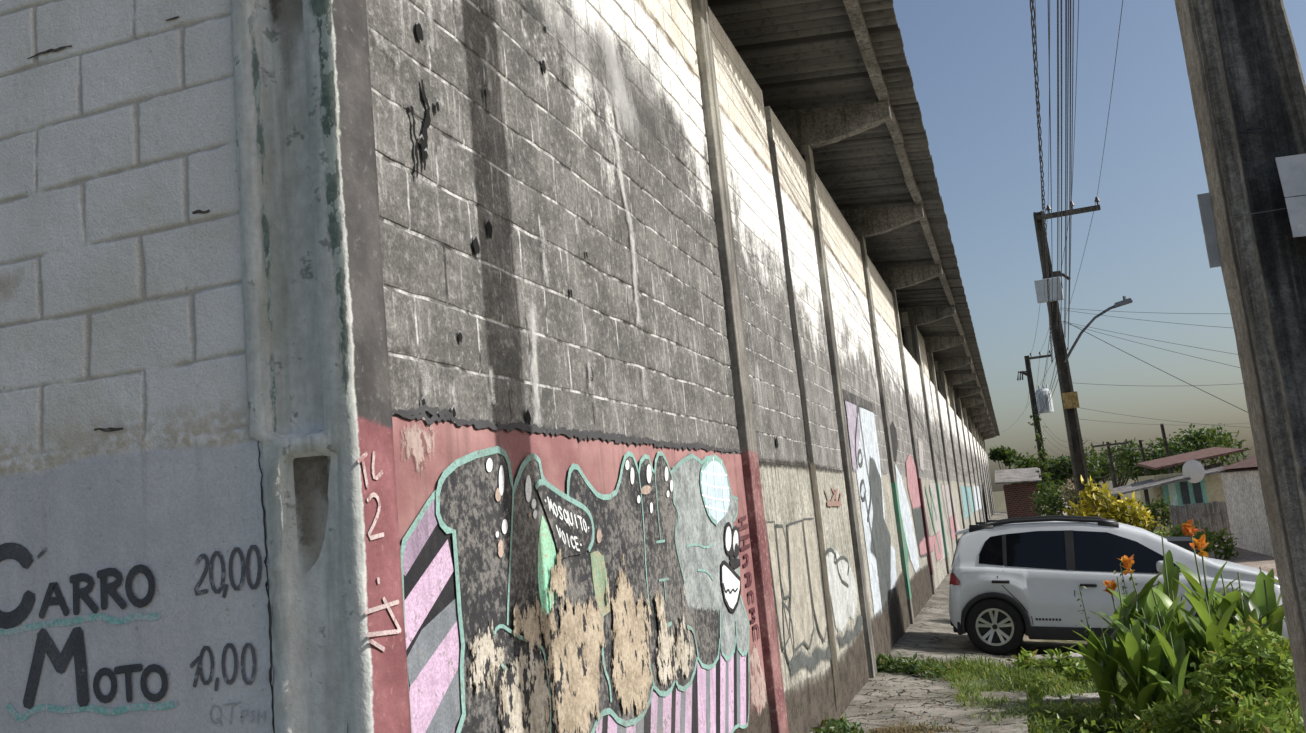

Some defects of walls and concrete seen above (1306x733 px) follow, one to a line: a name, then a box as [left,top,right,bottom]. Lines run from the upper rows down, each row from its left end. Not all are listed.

peeling [249,16,264,181]
peeling [262,204,272,327]
peeling [310,0,349,389]
leakage [412,79,431,178]
leakage [539,11,683,322]
leakage [758,132,933,733]
peeling [469,548,695,733]
leakage [733,700,771,733]